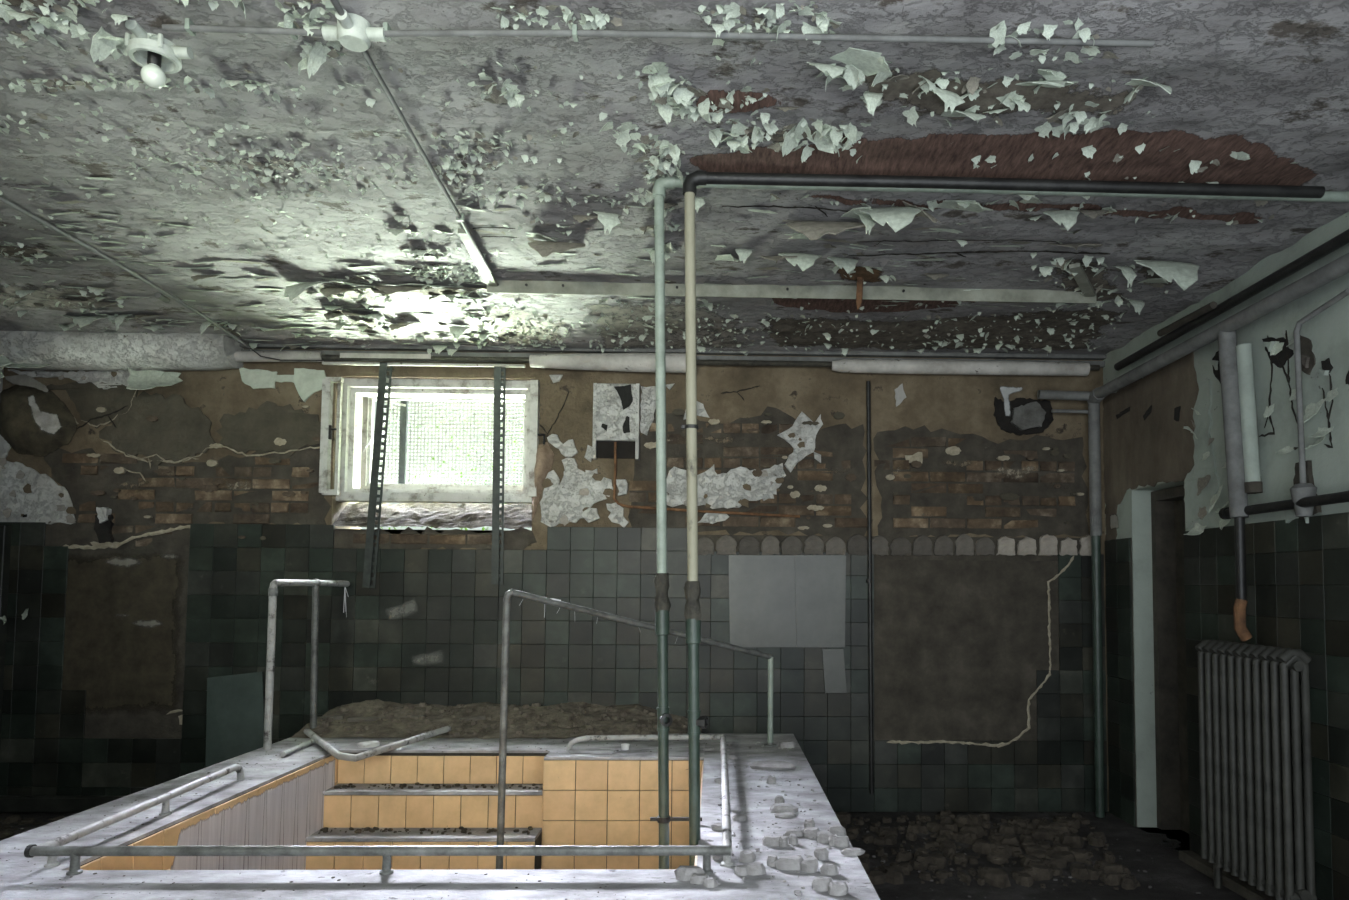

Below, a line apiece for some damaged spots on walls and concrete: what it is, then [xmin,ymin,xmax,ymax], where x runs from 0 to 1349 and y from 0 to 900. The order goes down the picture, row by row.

peeling [0,0,1199,357]
peeling [1178,151,1250,184]
flaking render [0,356,1089,550]
spalling [1103,351,1231,540]
peeling [1262,335,1349,523]